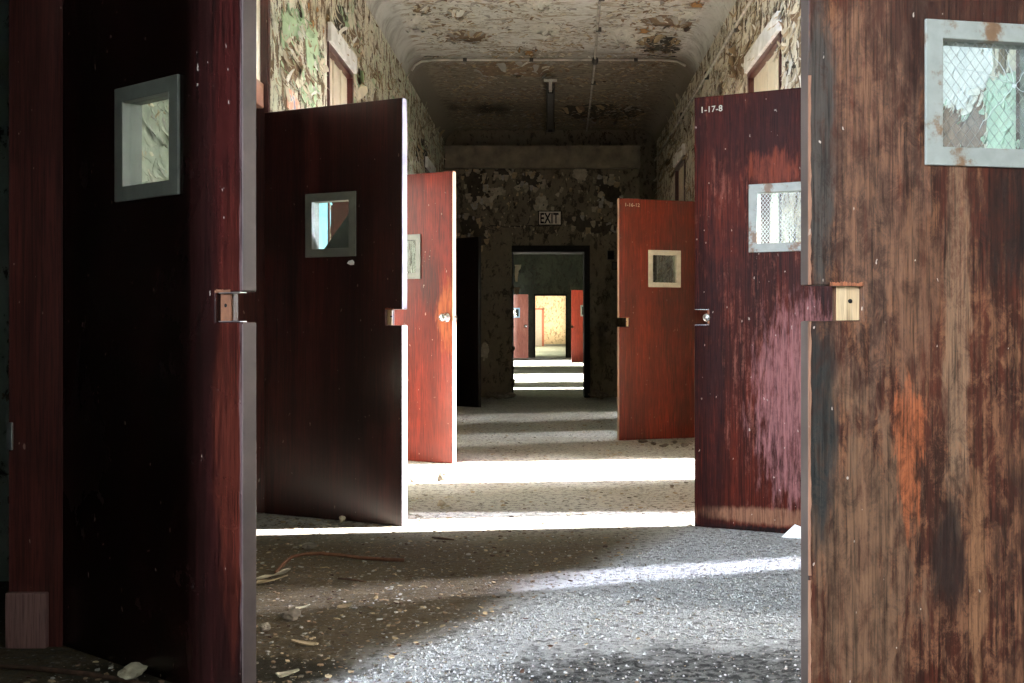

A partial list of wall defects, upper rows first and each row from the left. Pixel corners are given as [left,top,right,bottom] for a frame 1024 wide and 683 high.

peeling [404,0,696,78]
peeling [271,0,446,174]
peeling [653,0,801,201]
peeling [457,169,623,252]
peeling [655,255,674,283]